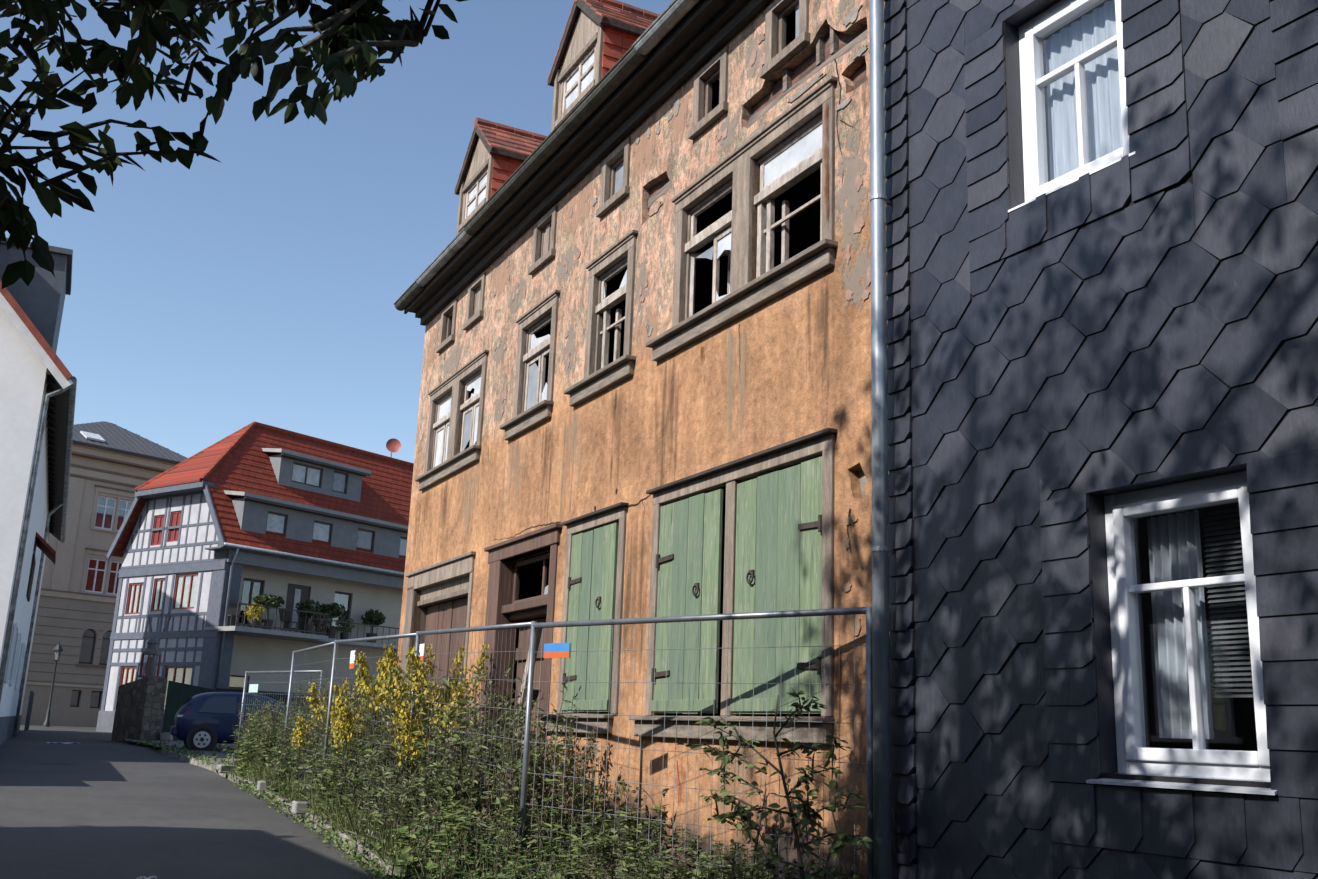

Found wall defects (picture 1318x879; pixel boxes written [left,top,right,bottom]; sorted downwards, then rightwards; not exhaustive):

flaking render [715,0,868,157]